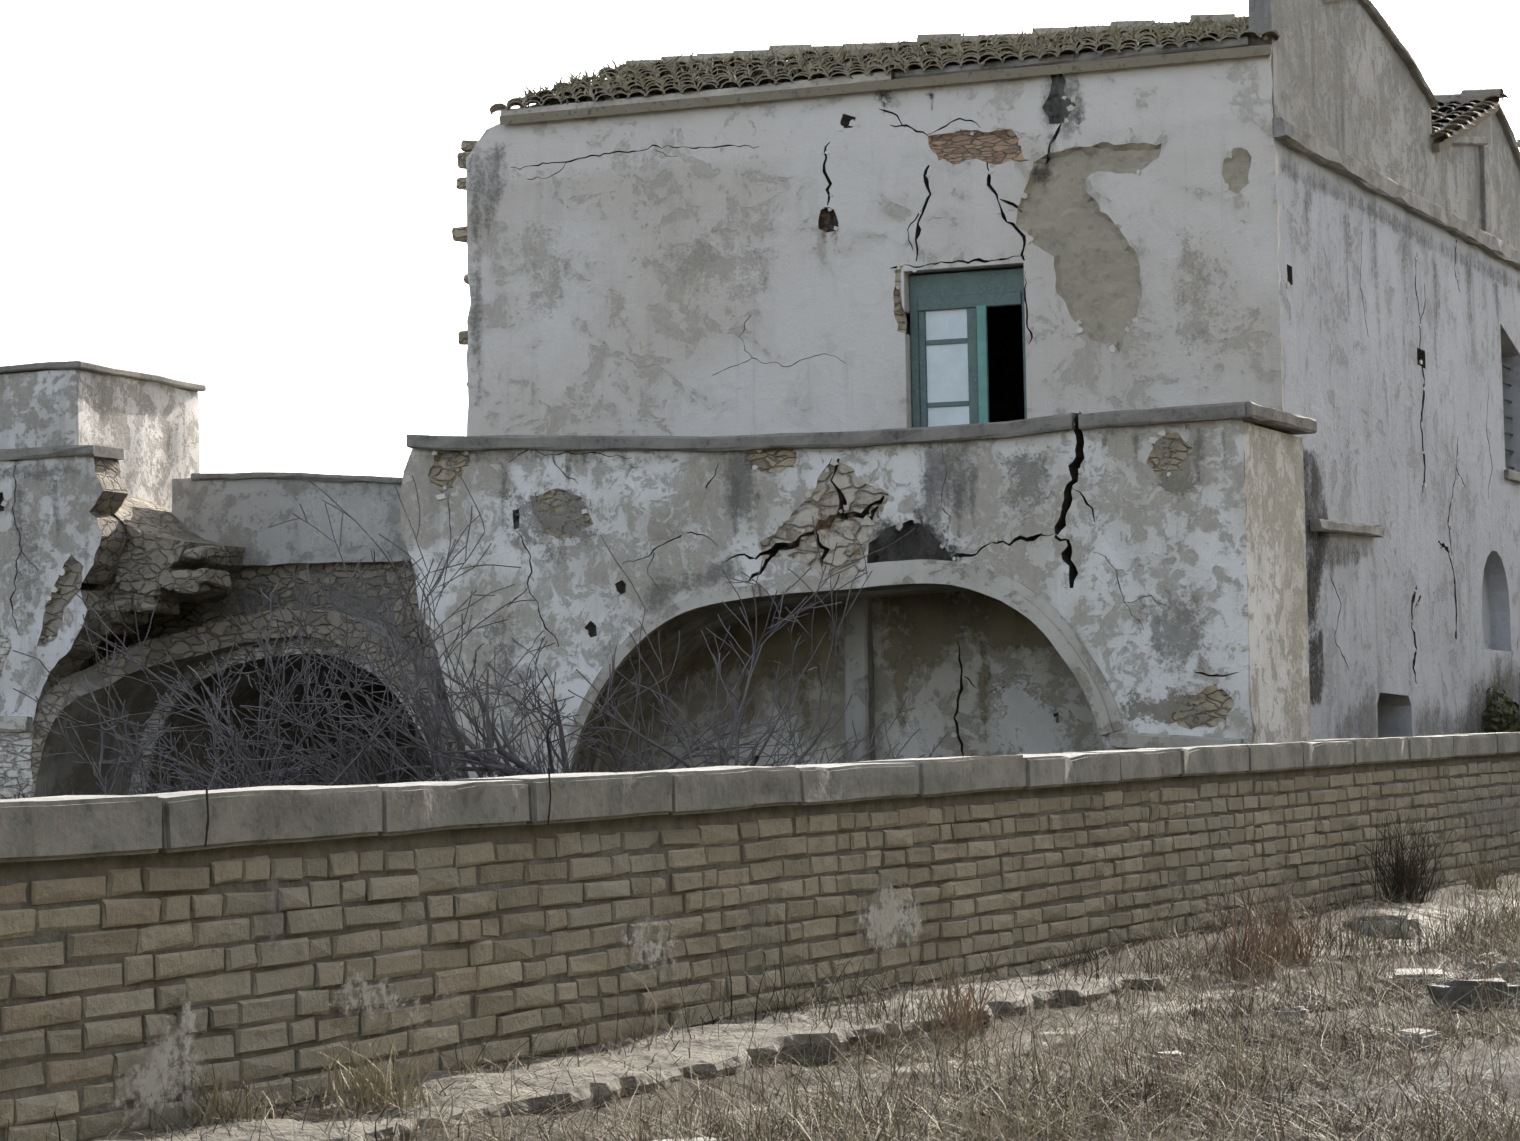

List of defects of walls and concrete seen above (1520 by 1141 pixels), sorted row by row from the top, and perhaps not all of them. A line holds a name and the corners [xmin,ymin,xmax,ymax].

crack [511,144,759,180]
crack [822,142,833,206]
crack [880,109,1033,342]
flaking render [928,125,1162,353]
flaking render [1221,147,1251,194]
flaking render [18,521,233,646]
peeling [502,485,598,561]
flaking render [760,458,956,579]
crack [946,412,1169,630]
flaking render [1146,430,1200,500]
crack [951,642,1003,756]
flaking render [1120,592,1234,729]